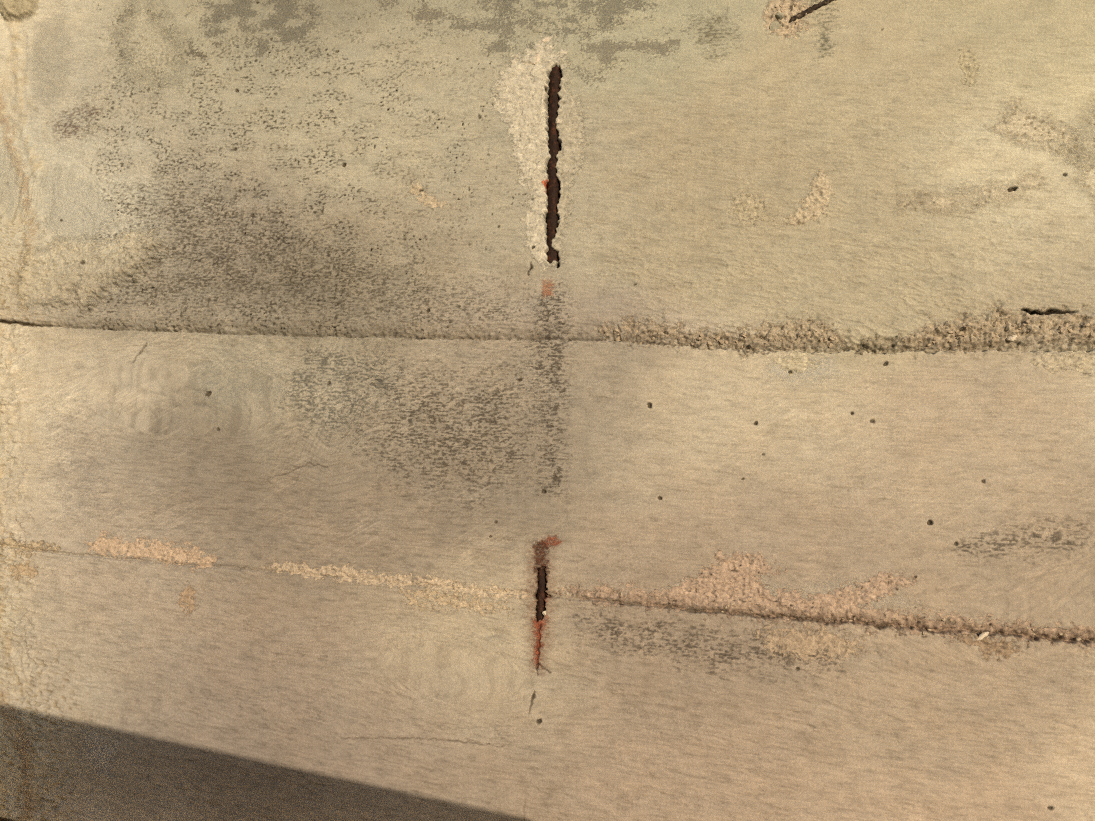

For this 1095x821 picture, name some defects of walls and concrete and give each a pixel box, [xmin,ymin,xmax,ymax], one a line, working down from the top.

spalling [762,0,834,40]
spalling [377,0,692,272]
rust [533,537,561,666]
spalling [262,548,1095,668]